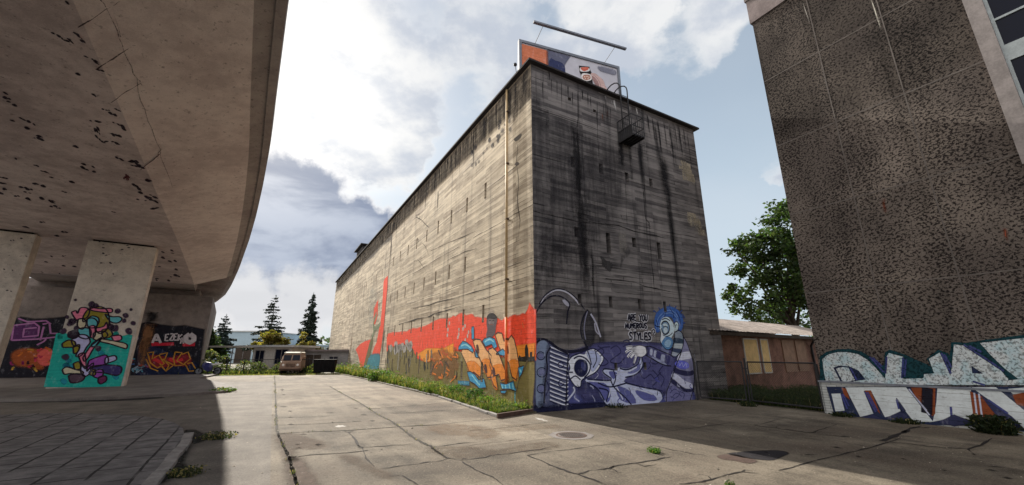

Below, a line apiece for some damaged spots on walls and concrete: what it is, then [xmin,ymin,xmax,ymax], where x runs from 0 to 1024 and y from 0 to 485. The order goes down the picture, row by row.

crack [78,0,169,176]
leakage [533,124,645,290]
leakage [636,108,695,245]
crack [343,419,992,485]